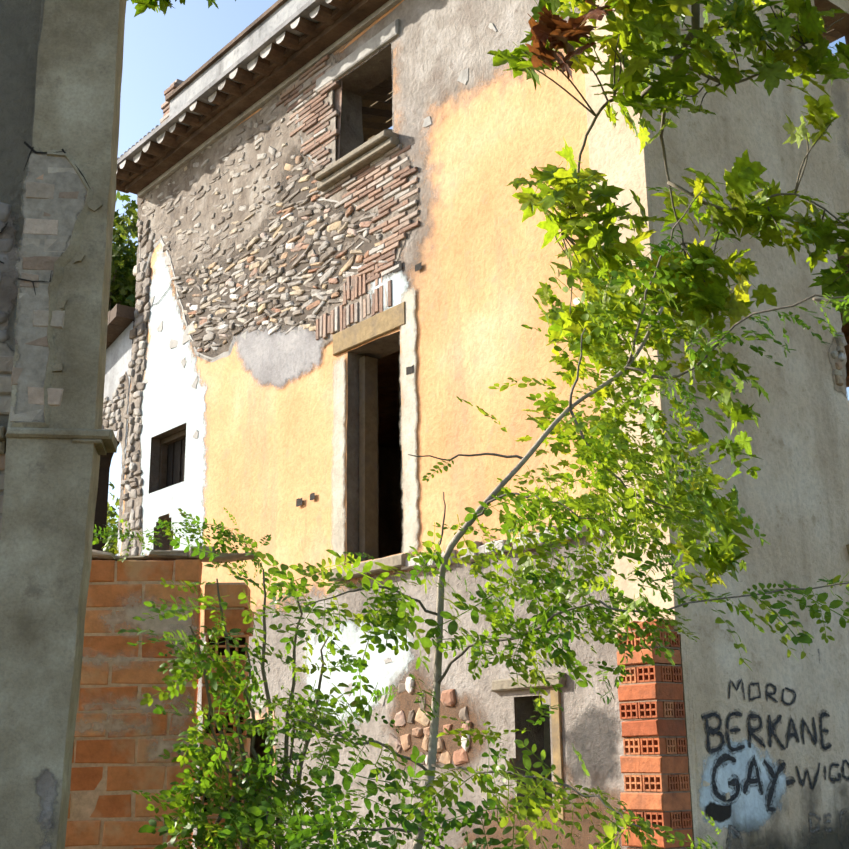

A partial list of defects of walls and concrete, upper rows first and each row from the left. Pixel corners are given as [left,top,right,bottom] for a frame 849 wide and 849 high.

spalling [0,150,103,428]
spalling [102,54,420,556]
spalling [828,333,848,397]
spalling [305,620,485,767]